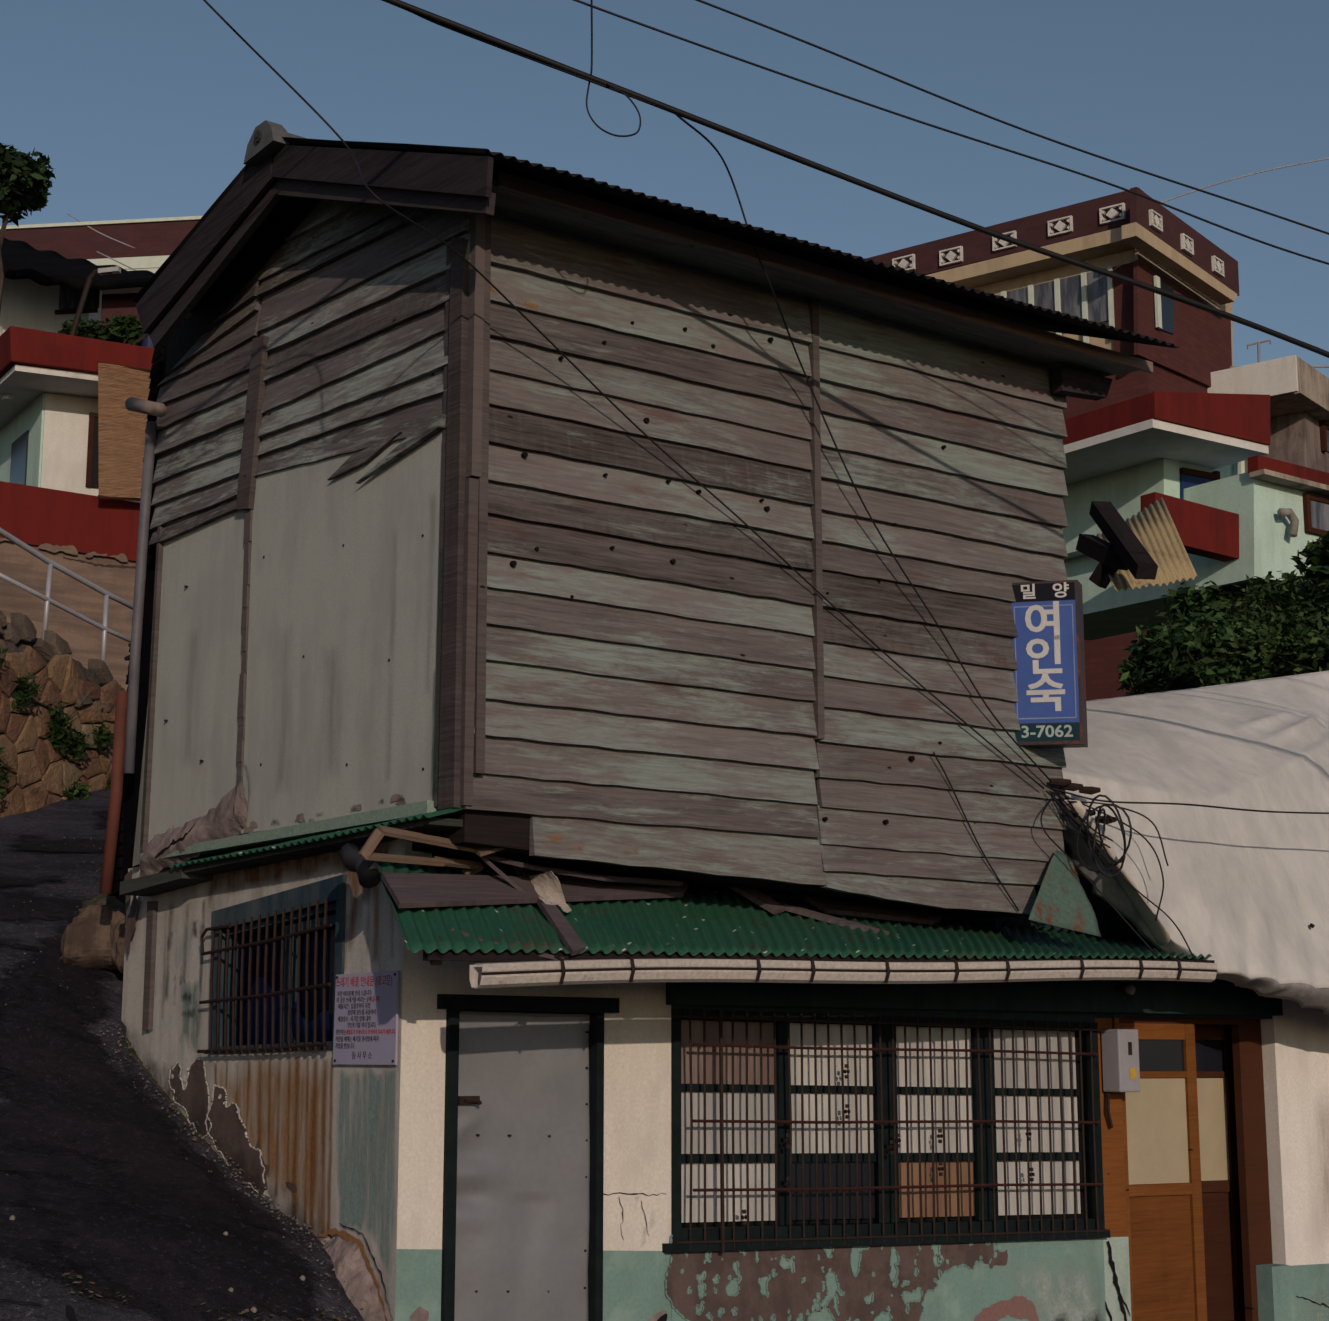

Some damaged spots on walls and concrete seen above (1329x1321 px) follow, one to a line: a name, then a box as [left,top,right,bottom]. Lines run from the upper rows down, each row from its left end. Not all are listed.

peeling [381,794,406,805]
peeling [168,1058,269,1197]
rust [215,1060,332,1236]
crack [603,1192,664,1240]
flaking render [315,1223,393,1321]
peeling [410,1306,429,1321]
peeling [649,1235,1008,1321]